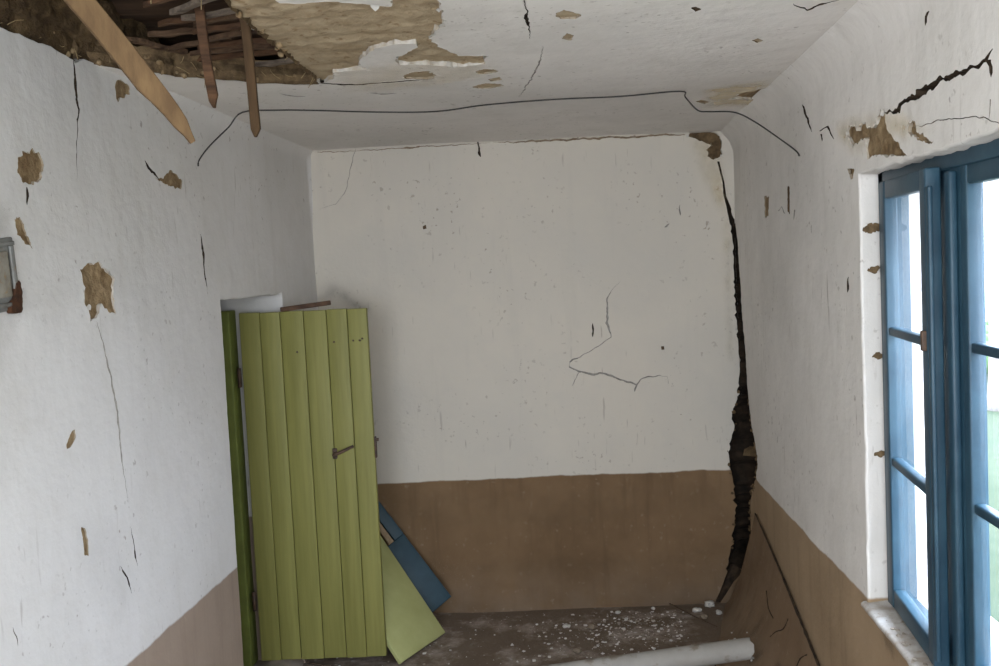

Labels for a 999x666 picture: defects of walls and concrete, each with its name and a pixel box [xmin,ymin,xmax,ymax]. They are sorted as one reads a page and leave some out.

spalling [317,1,503,89]
spalling [115,80,130,102]
crack [886,49,999,128]
spalling [846,109,907,159]
spalling [908,120,933,144]
spalling [17,148,44,185]
spalling [156,170,182,189]
spalling [80,261,116,322]
crack [569,283,668,392]
crack [715,162,758,602]